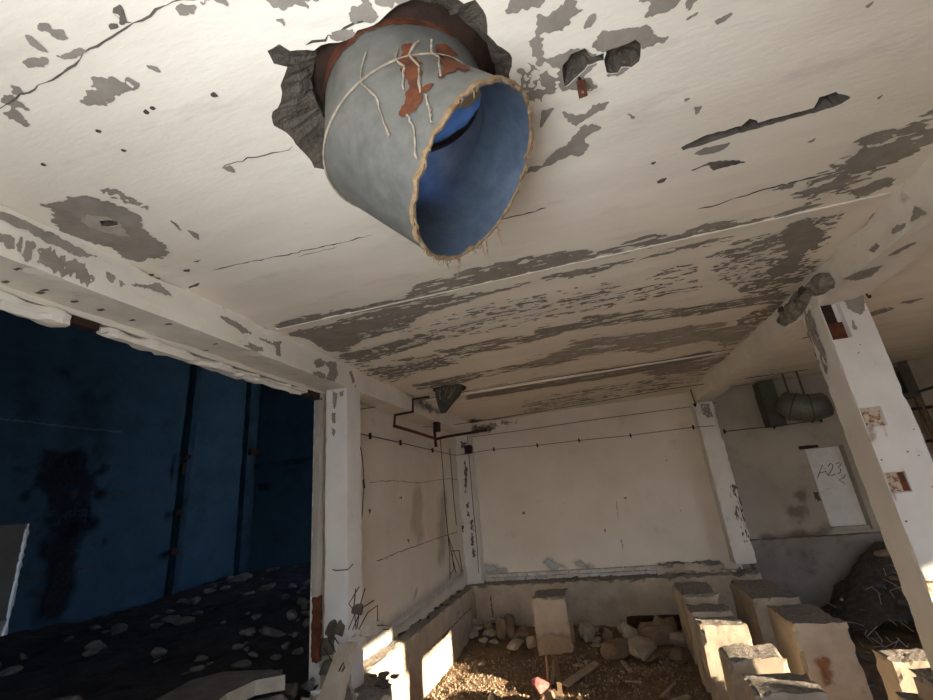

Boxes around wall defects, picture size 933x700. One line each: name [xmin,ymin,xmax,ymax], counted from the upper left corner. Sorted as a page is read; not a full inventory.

crack [0,0,194,109]
peeling [175,0,229,16]
crack [222,148,291,169]
corrosion [324,18,470,117]
spalling [266,0,698,174]
spalling [681,92,850,171]
peeling [0,188,170,287]
peeling [106,272,171,296]
crack [213,235,369,270]
peeling [220,110,933,436]
leakage [22,450,106,620]
corrosion [817,657,831,685]